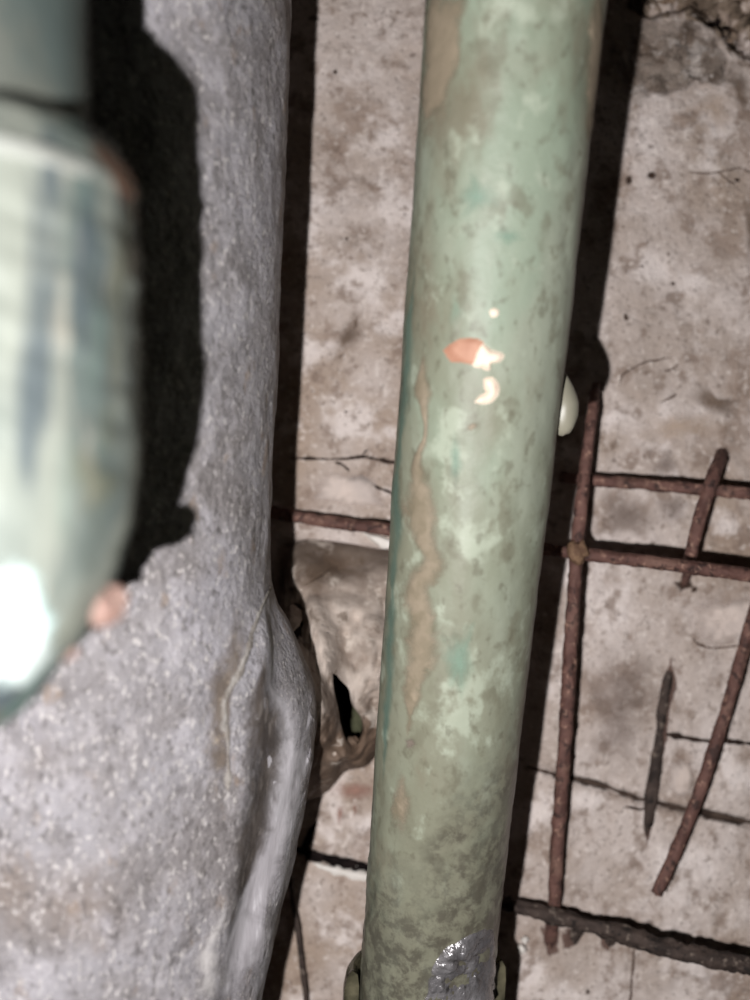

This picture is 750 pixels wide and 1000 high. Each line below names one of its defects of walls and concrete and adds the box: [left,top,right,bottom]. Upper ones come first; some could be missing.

crack [287,449,394,494]
rust [541,927,574,955]